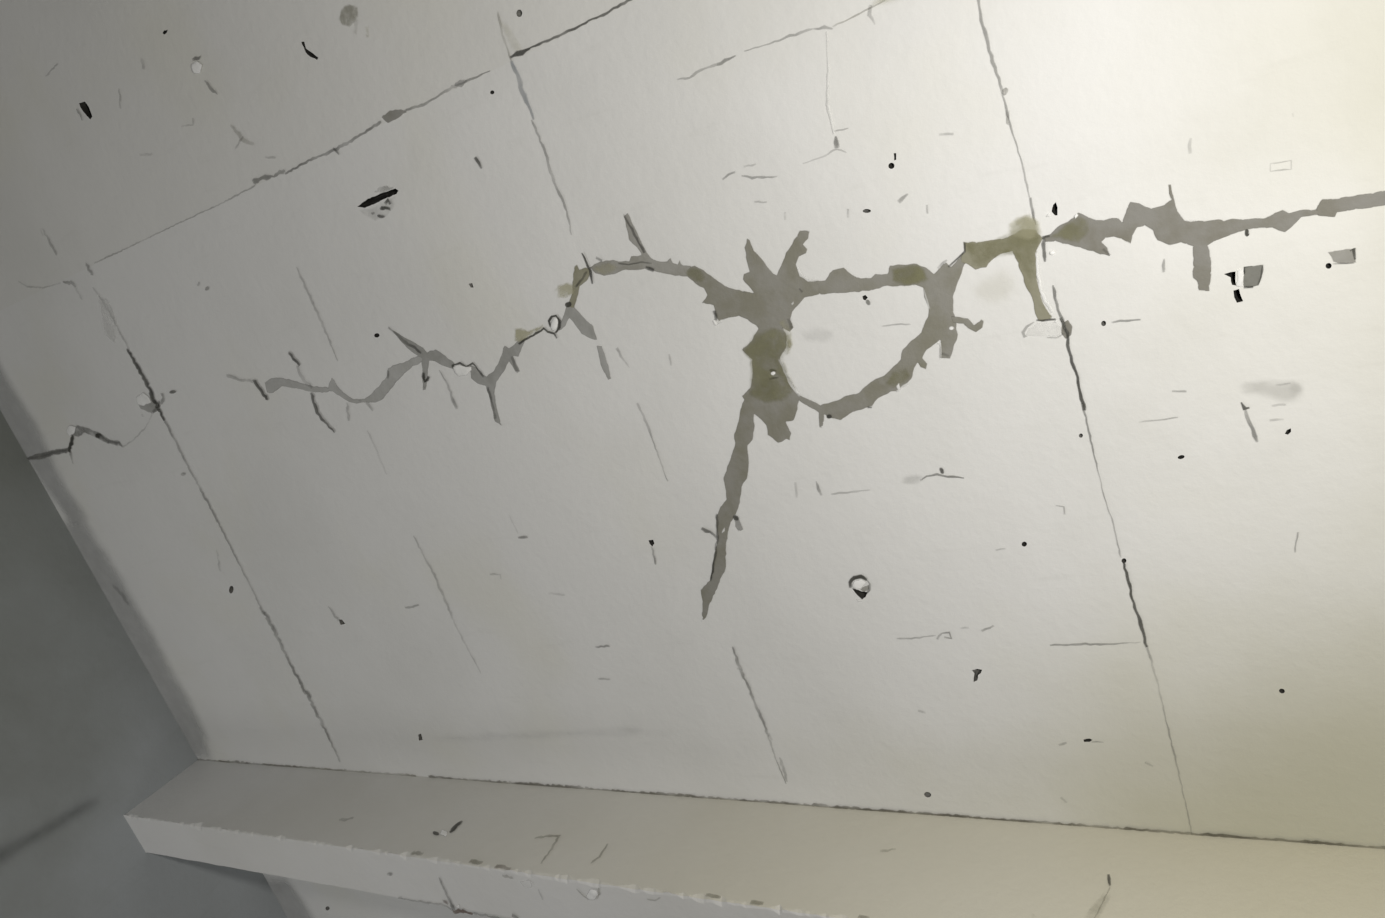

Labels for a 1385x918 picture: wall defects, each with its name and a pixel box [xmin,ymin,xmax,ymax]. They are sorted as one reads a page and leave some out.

crack [510,0,631,58]
crack [253,110,406,183]
spalling [1326,248,1356,269]
spalling [1225,265,1263,303]
crack [100,298,165,421]
crack [253,185,1385,620]
crack [28,426,120,460]
crack [1123,560,1148,647]
crack [491,780,571,788]
crack [611,790,701,798]
crack [833,806,1077,826]
crack [1197,833,1358,847]